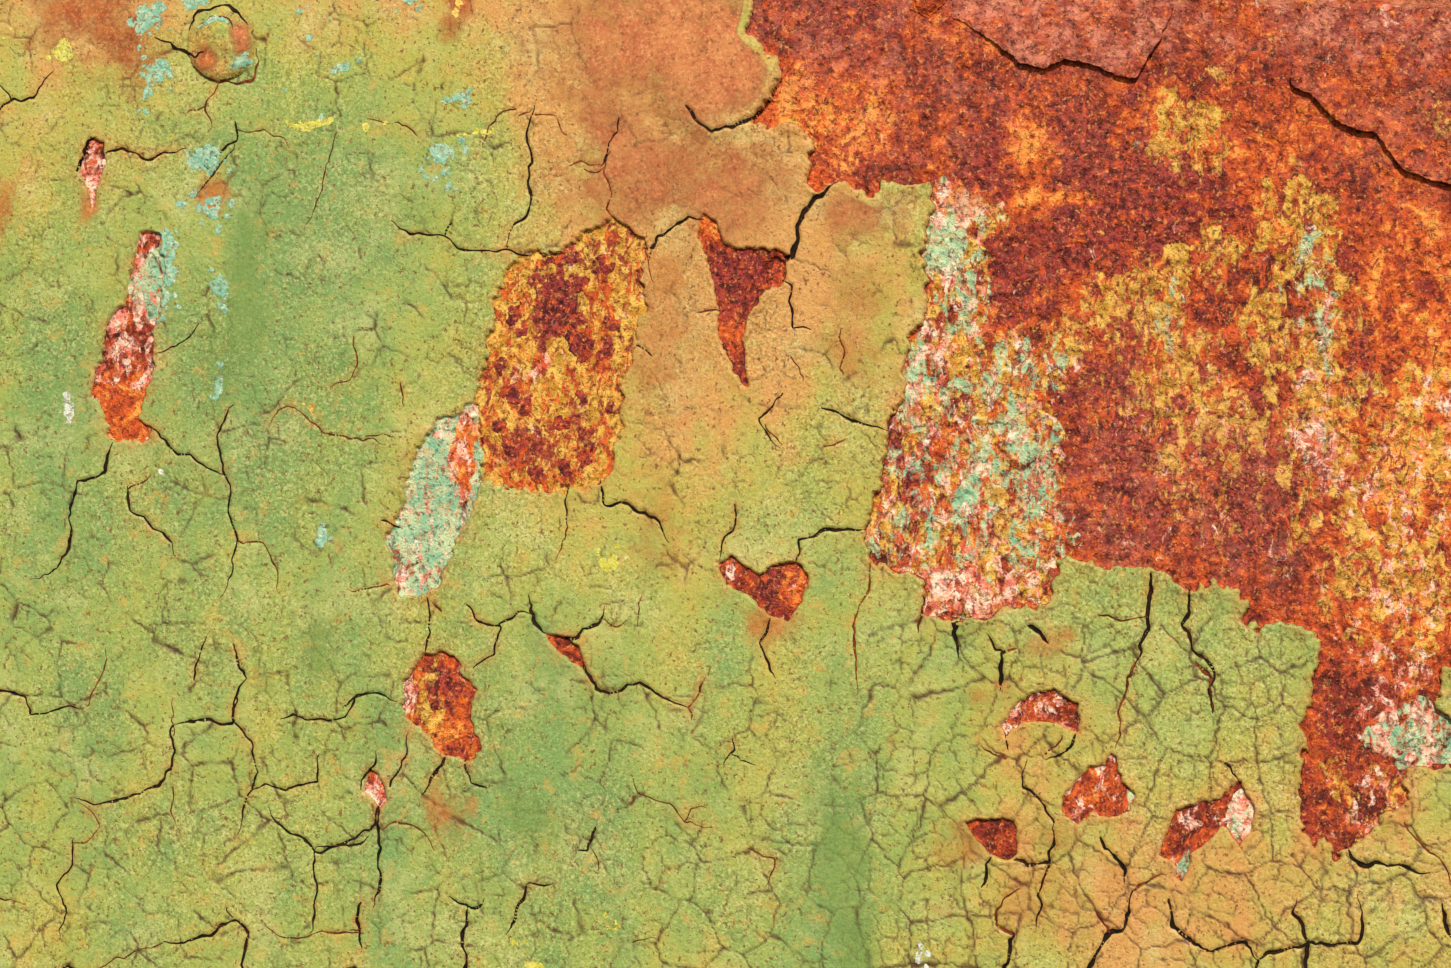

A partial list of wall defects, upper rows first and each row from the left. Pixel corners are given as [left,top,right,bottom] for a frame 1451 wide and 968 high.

corrosion [445,0,470,26]
crack [33,404,279,598]
peeling [385,218,648,597]
corrosion [572,0,785,233]
peeling [698,214,789,387]
peeling [719,555,809,621]
crack [758,183,888,448]
corrosion [831,194,880,231]
peeling [745,0,1451,862]
crack [56,638,487,968]
peeling [1159,781,1255,881]
crack [1087,822,1451,968]